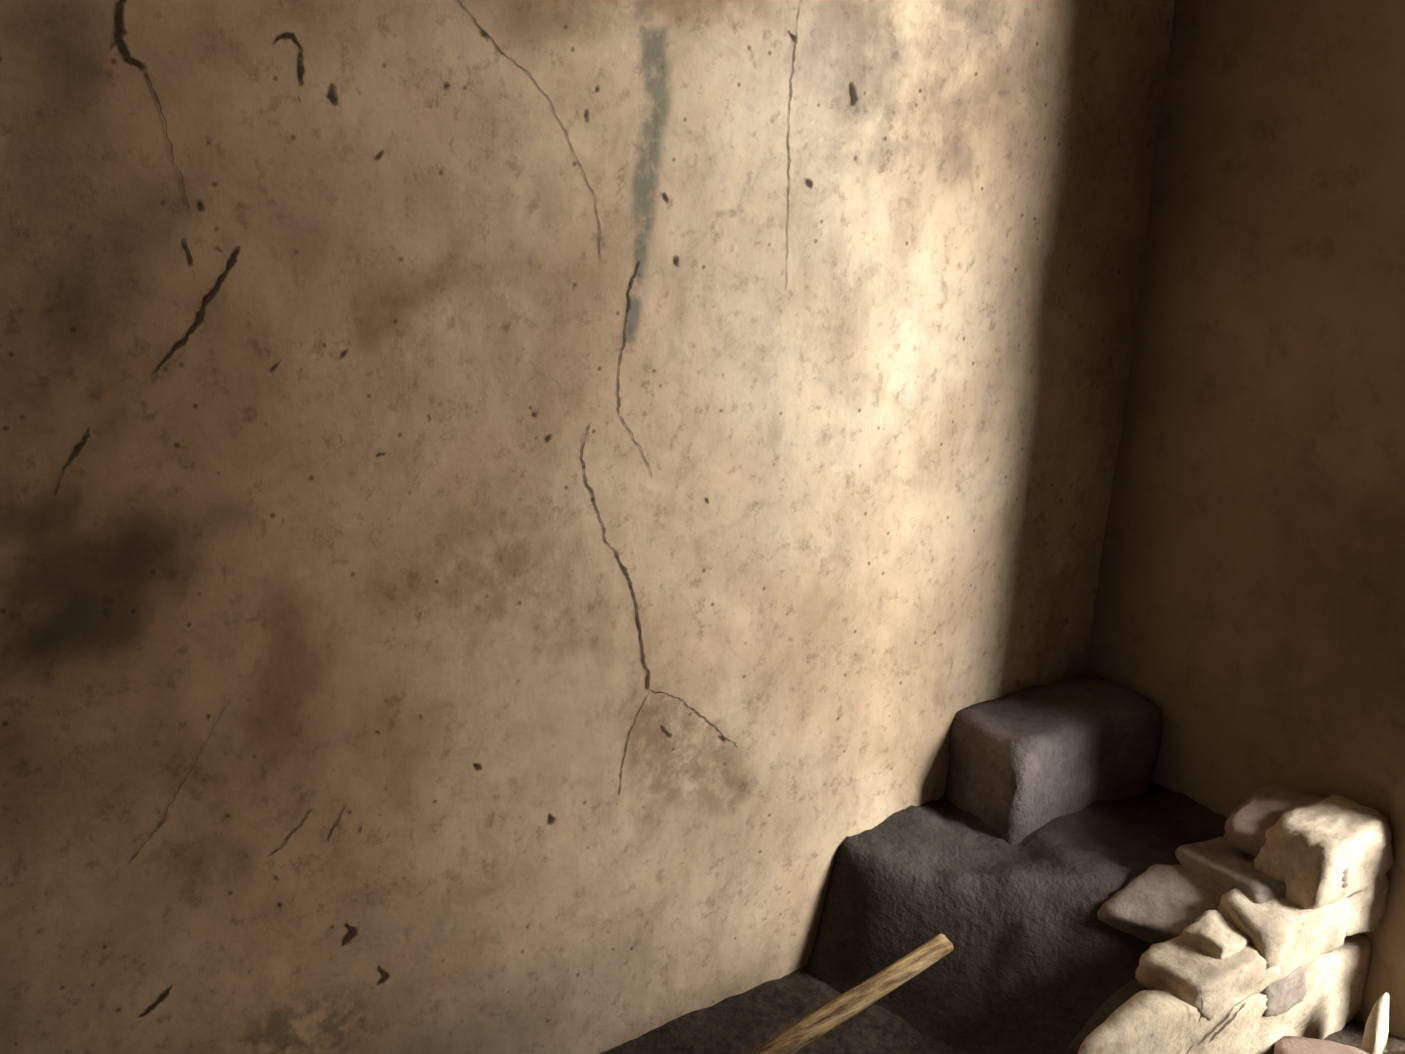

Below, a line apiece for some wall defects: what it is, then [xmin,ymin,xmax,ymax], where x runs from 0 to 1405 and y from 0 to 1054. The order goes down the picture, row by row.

crack [111,0,240,372]
crack [458,0,601,252]
water stain [635,32,666,277]
crack [581,262,736,793]